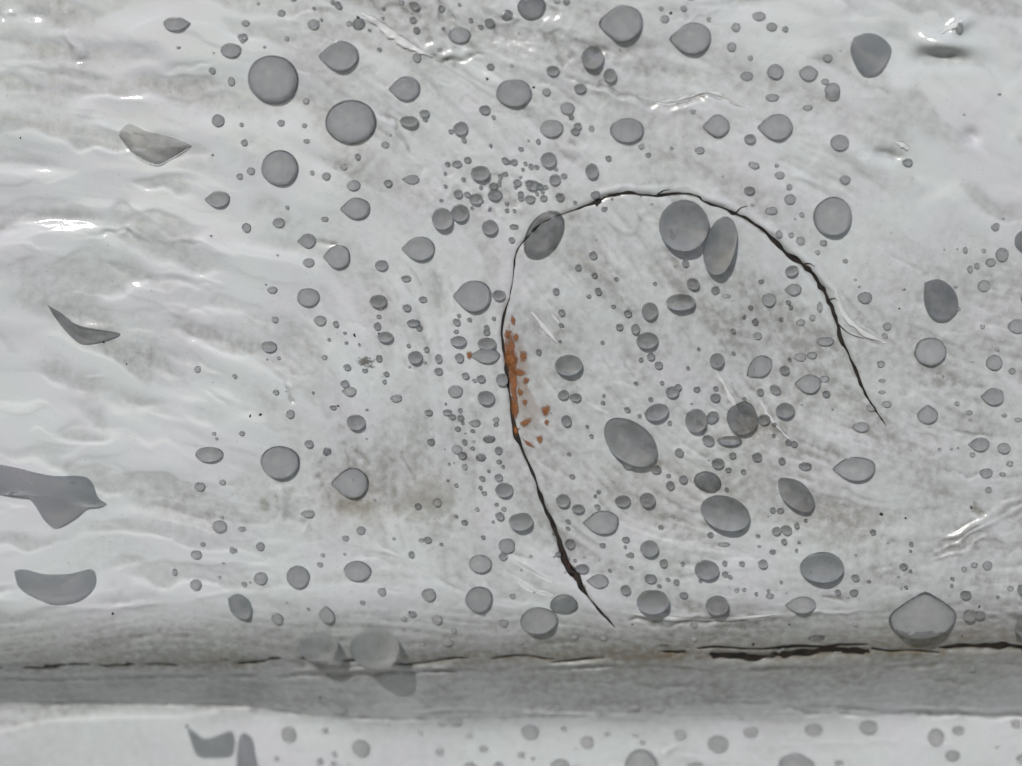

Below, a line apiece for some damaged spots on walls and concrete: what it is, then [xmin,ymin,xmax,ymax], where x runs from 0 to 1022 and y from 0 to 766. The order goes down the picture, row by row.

crack [560,189,885,424]
corrosion [504,317,542,447]
crack [501,239,615,627]
crack [25,662,179,670]
crack [238,656,306,664]
crack [394,657,466,665]
crack [492,655,604,663]
crack [661,641,1022,661]